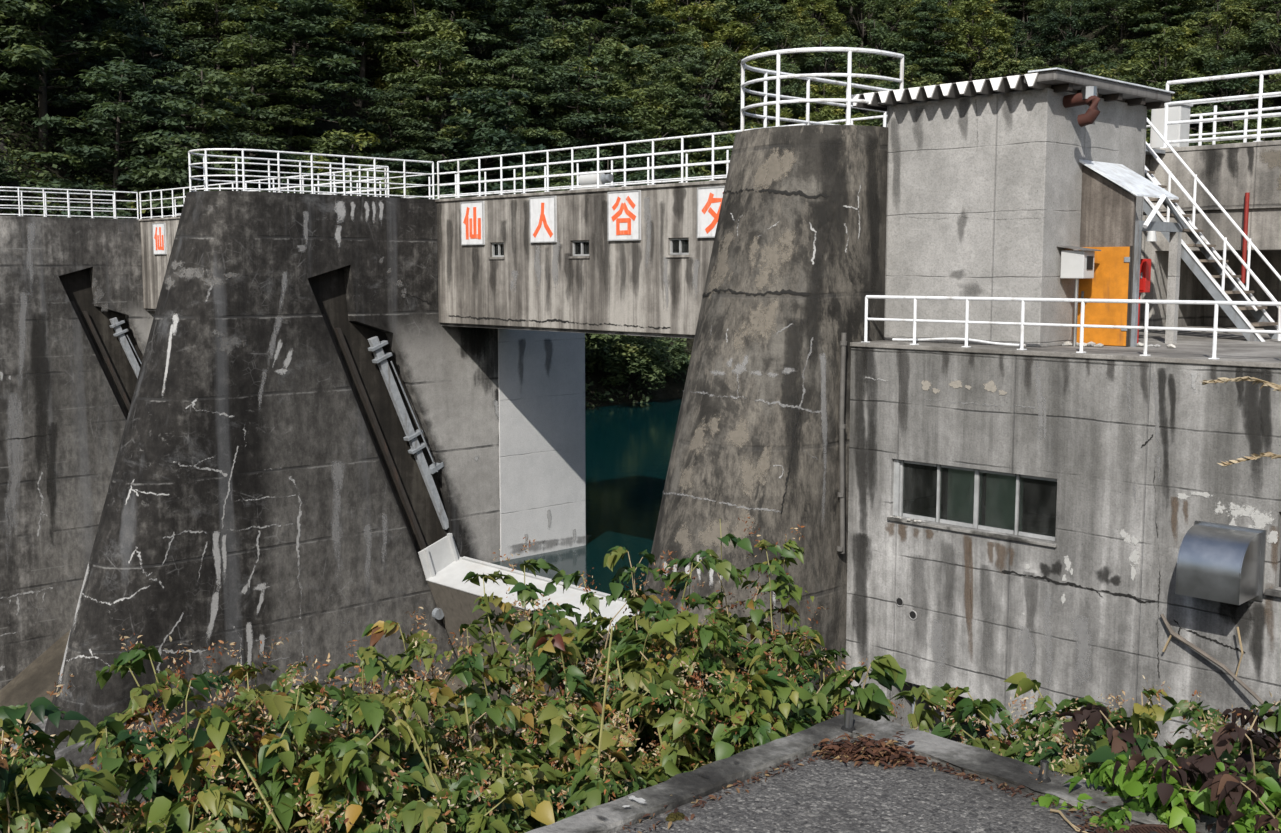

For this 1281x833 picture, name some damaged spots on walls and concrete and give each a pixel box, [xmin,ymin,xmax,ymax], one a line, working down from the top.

damp [335,201,384,244]
damp [0,223,57,538]
crack [664,185,861,514]
spalling [921,380,1007,395]
damp [1236,366,1271,471]
crack [0,399,323,688]
damp [207,531,227,637]
damp [241,583,266,680]
damp [853,347,876,650]
crack [1001,570,1245,678]
peeling [1177,492,1278,543]
damp [1219,602,1265,673]